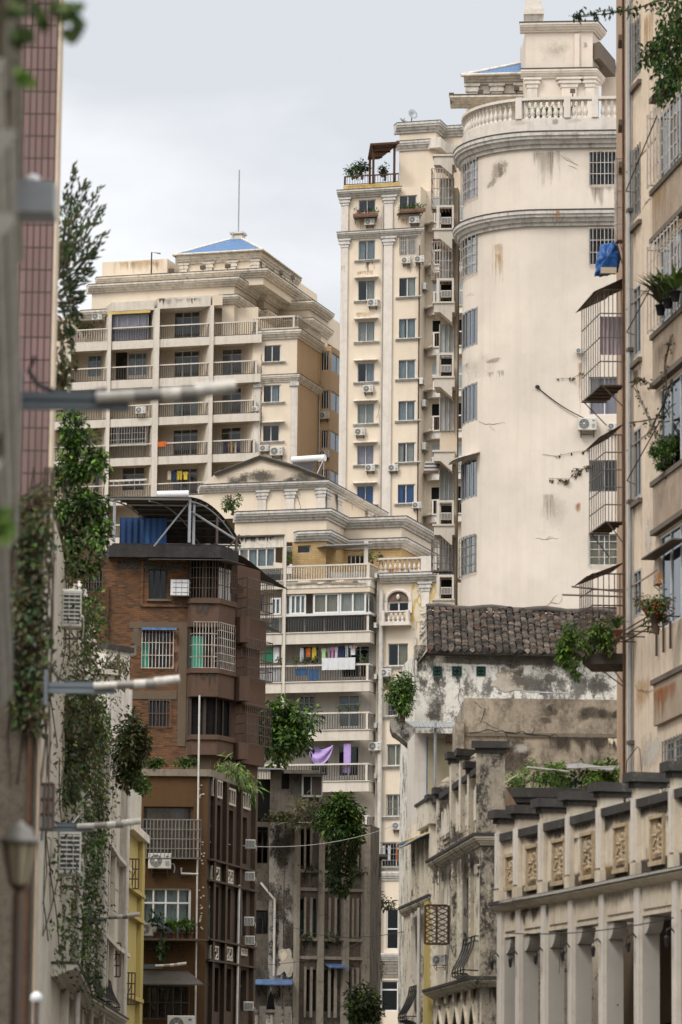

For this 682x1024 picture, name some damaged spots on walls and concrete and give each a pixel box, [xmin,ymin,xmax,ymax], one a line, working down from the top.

leakage [417,658,443,720]
leakage [441,656,559,692]
crack [454,676,565,740]
leakage [540,705,558,723]
leakage [582,676,611,693]
leakage [578,706,617,720]
leakage [274,829,295,872]
leakage [257,882,338,950]